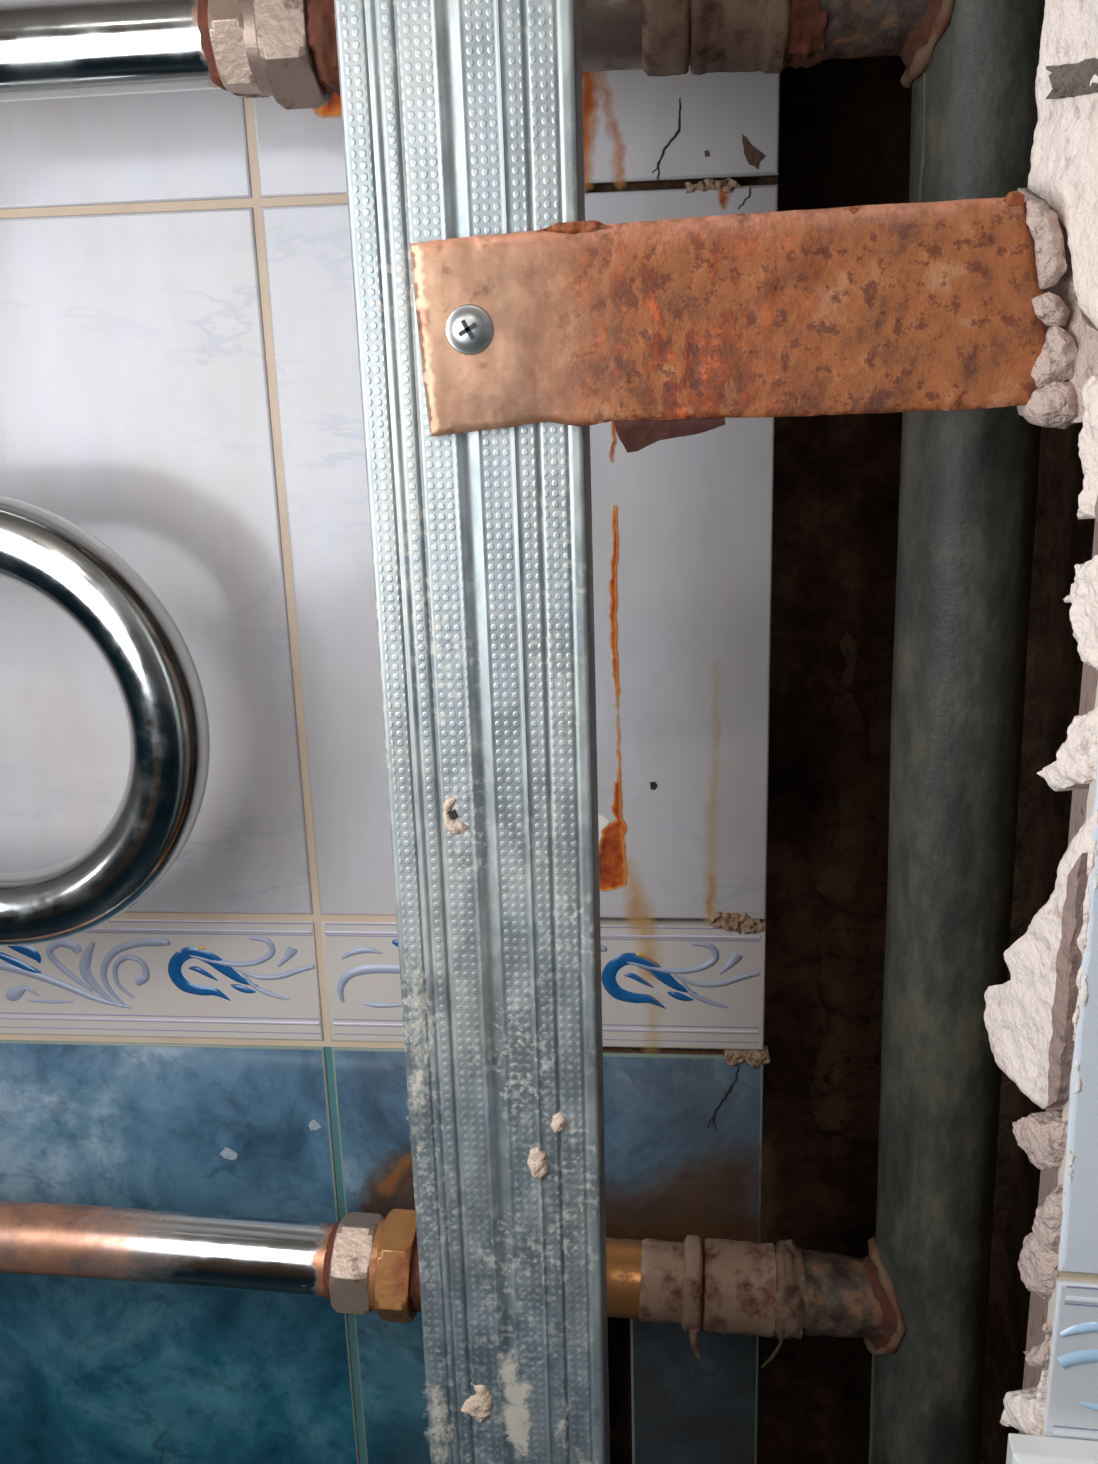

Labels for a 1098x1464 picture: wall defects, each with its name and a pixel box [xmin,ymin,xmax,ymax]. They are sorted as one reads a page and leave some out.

corrosion [582,72,622,188]
crack [652,98,681,183]
spalling [1046,58,1098,99]
corrosion [538,220,612,234]
flaking render [1017,188,1098,522]
flaking render [1063,555,1098,670]
corrosion [599,505,627,891]
flaking render [1037,706,1098,792]
crack [707,1067,739,1131]
flaking render [984,809,1098,1299]
flaking render [1000,1322,1053,1436]